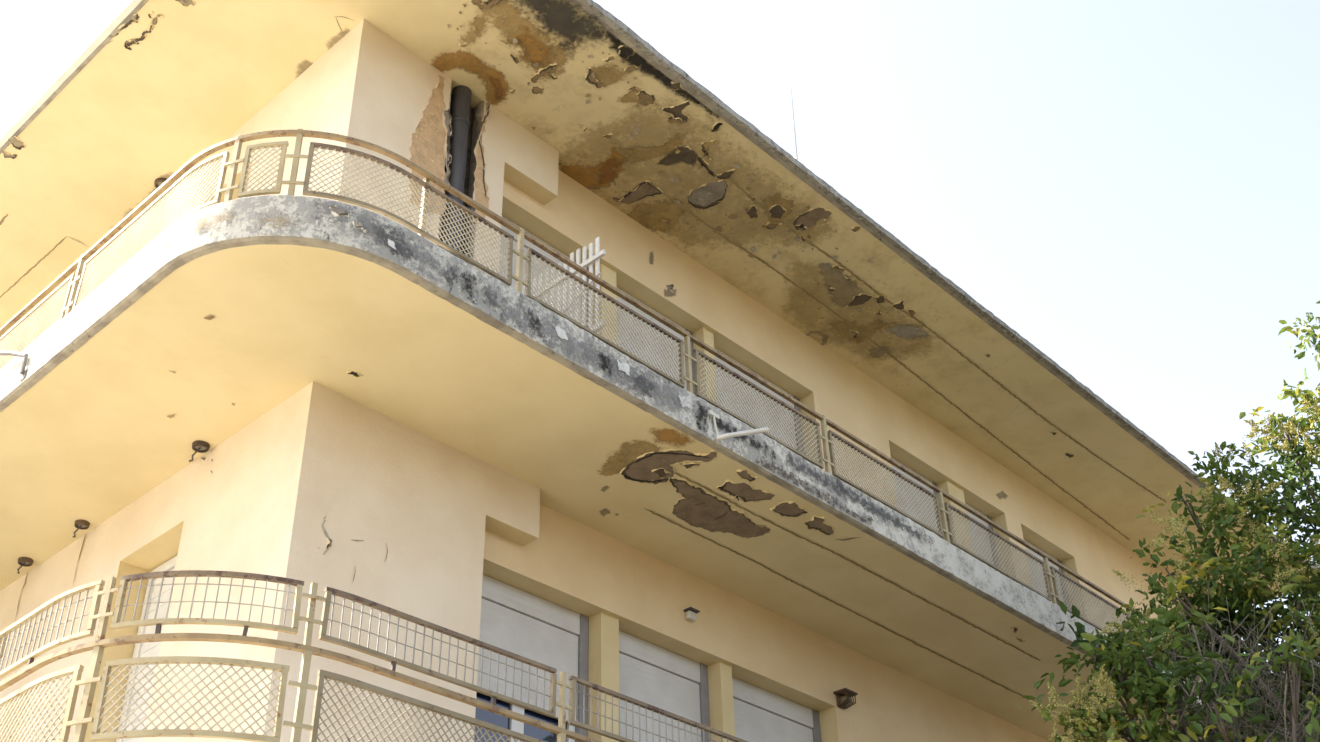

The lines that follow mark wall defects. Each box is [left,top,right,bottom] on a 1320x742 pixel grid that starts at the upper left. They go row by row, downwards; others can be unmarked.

peeling [110,0,164,50]
peeling [509,62,560,94]
leakage [447,0,719,118]
peeling [585,55,690,125]
leakage [374,226,417,258]
spalling [612,180,665,204]
spalling [686,139,735,210]
peeling [745,195,832,242]
leakage [444,267,500,311]
peeling [819,263,917,317]
leakage [806,297,929,358]
spalling [619,448,861,541]